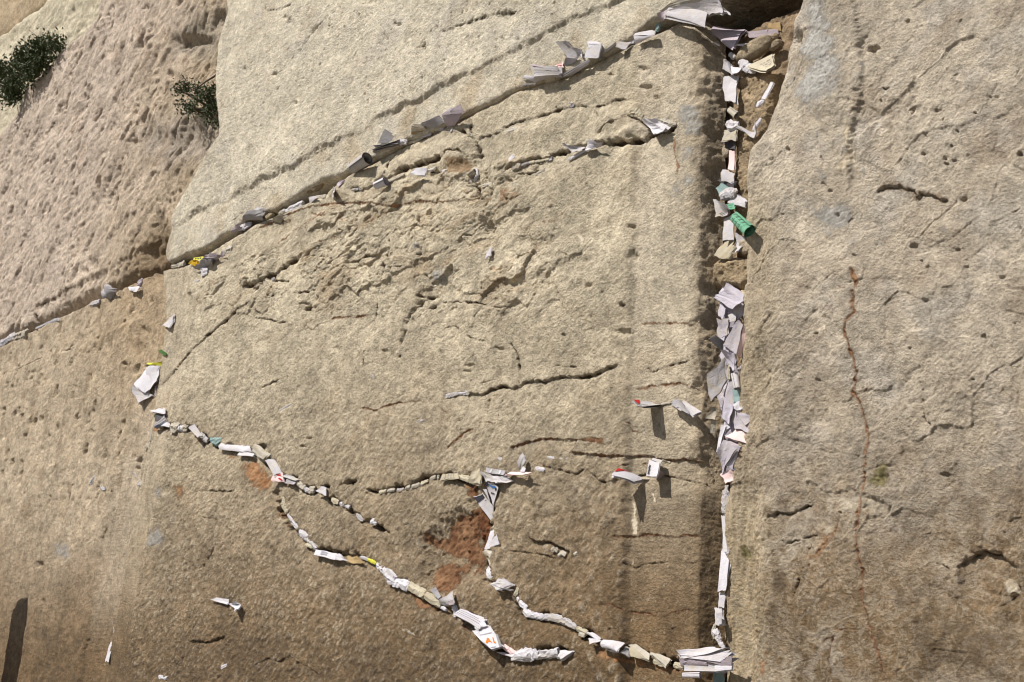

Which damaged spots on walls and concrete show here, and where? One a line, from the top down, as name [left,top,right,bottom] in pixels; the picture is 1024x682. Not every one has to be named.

crack [362,401,416,411]
crack [443,345,602,448]
crack [791,267,896,677]
rust [424,483,493,594]